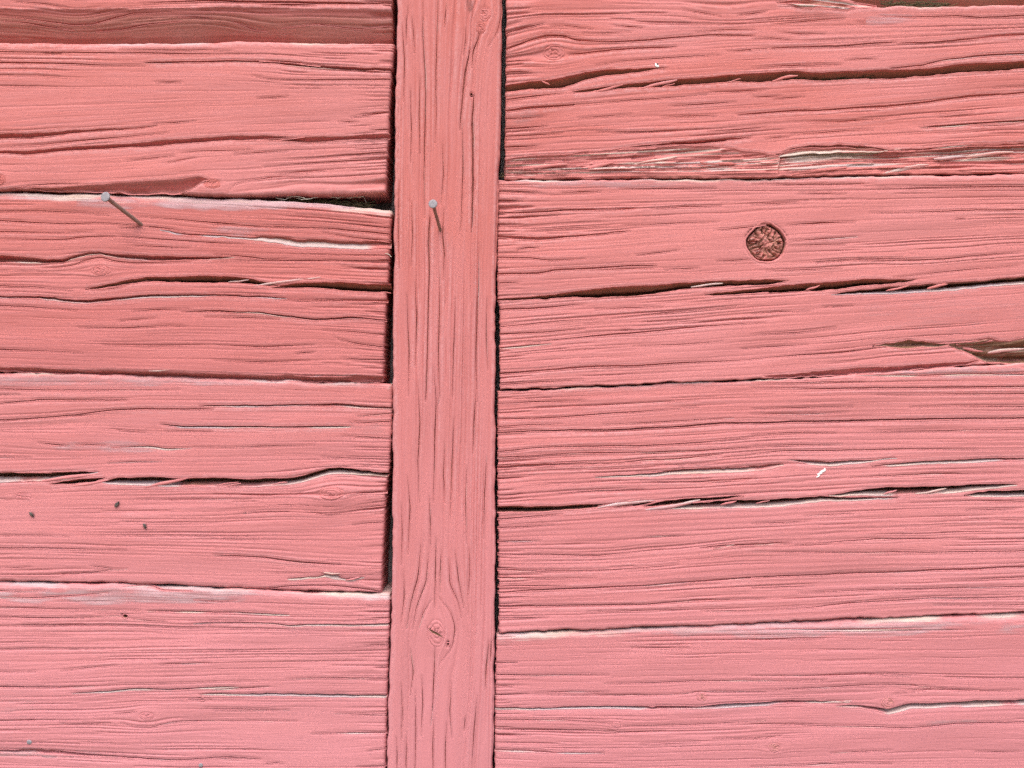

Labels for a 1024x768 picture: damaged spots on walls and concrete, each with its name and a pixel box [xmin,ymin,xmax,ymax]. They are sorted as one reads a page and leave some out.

crack [0,0,471,768]
crack [458,1,1024,619]